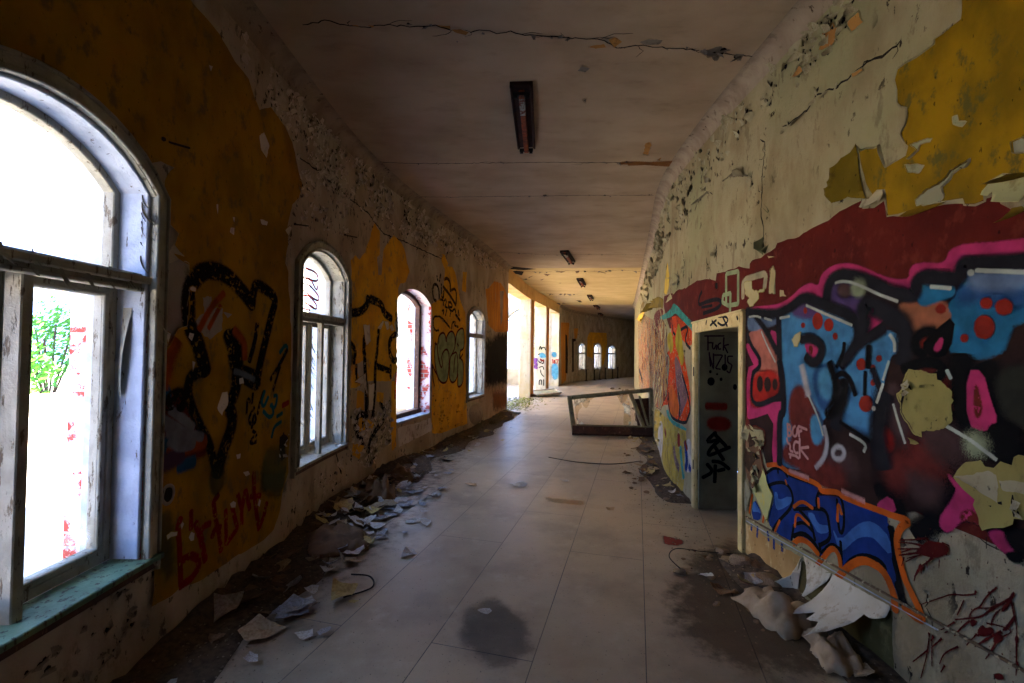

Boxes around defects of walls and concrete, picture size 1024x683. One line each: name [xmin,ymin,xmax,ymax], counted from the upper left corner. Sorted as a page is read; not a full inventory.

crack [302,19,752,57]
crack [753,40,901,255]
peeling [823,0,1024,223]
peeling [636,0,864,445]
peeling [896,369,954,445]
peeling [953,455,1024,531]
flaking render [843,609,896,671]